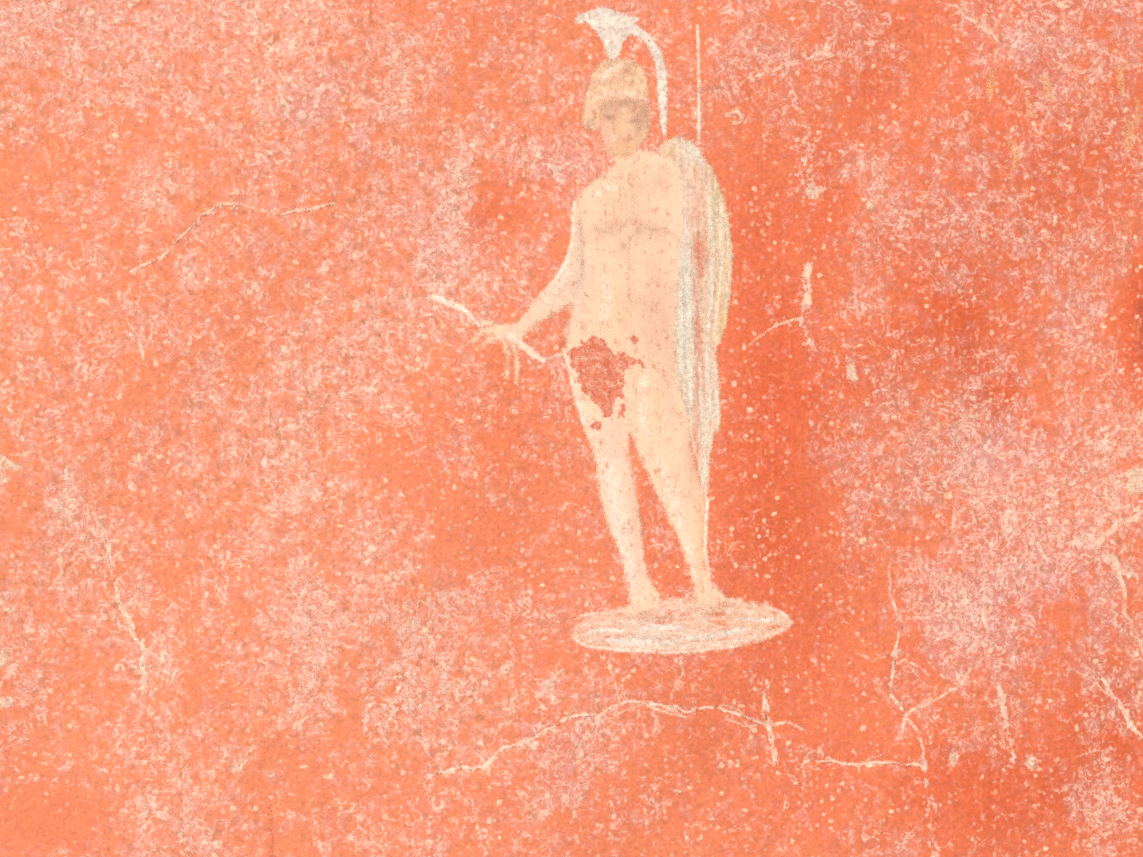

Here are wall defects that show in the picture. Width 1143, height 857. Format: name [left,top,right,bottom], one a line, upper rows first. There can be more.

crack [129,201,370,273]
crack [422,557,971,783]